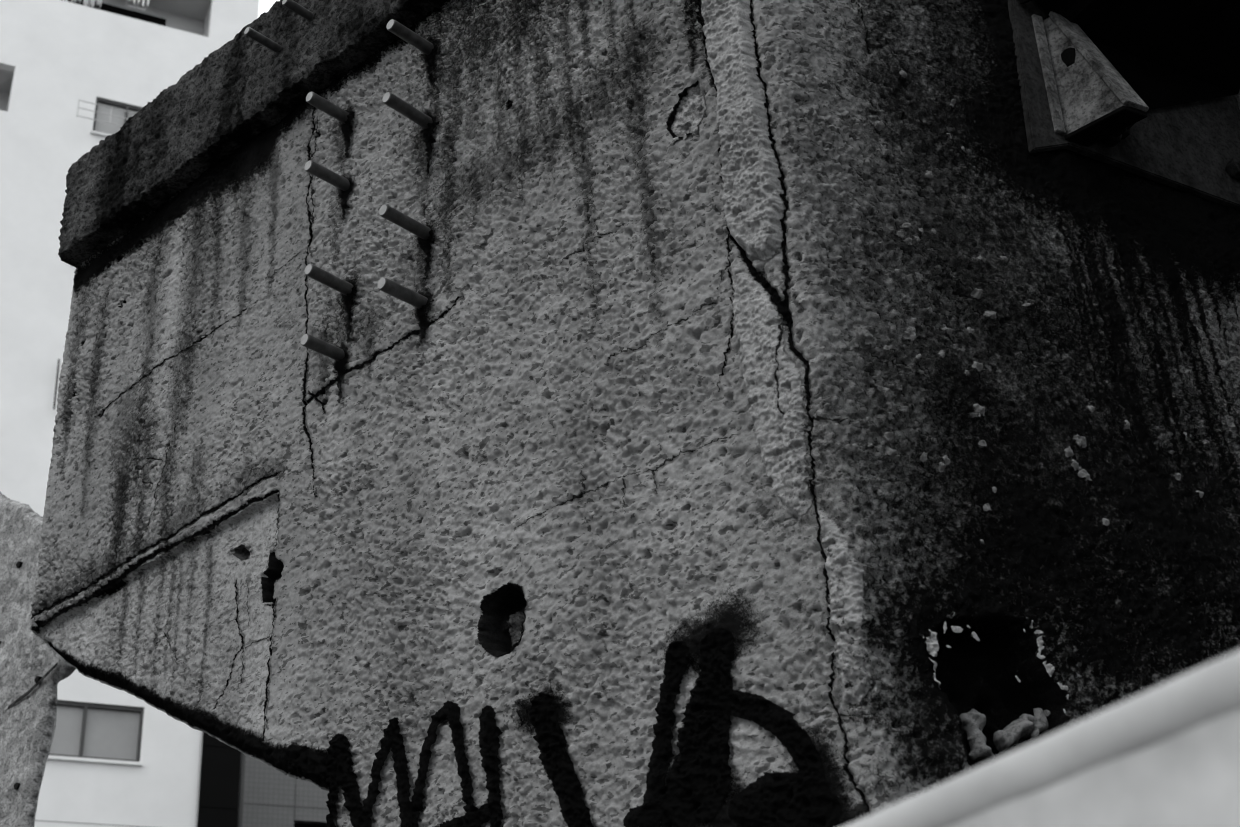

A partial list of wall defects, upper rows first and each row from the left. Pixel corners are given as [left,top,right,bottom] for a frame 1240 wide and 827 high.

damp [682,0,715,86]
crack [31,107,462,634]
damp [35,0,660,790]
crack [608,0,878,815]
damp [795,0,1240,797]
crack [0,662,58,716]
spalling [228,543,252,561]
crack [213,580,276,738]
spalling [258,552,284,606]
spalling [477,582,527,657]
spalling [919,612,1070,770]